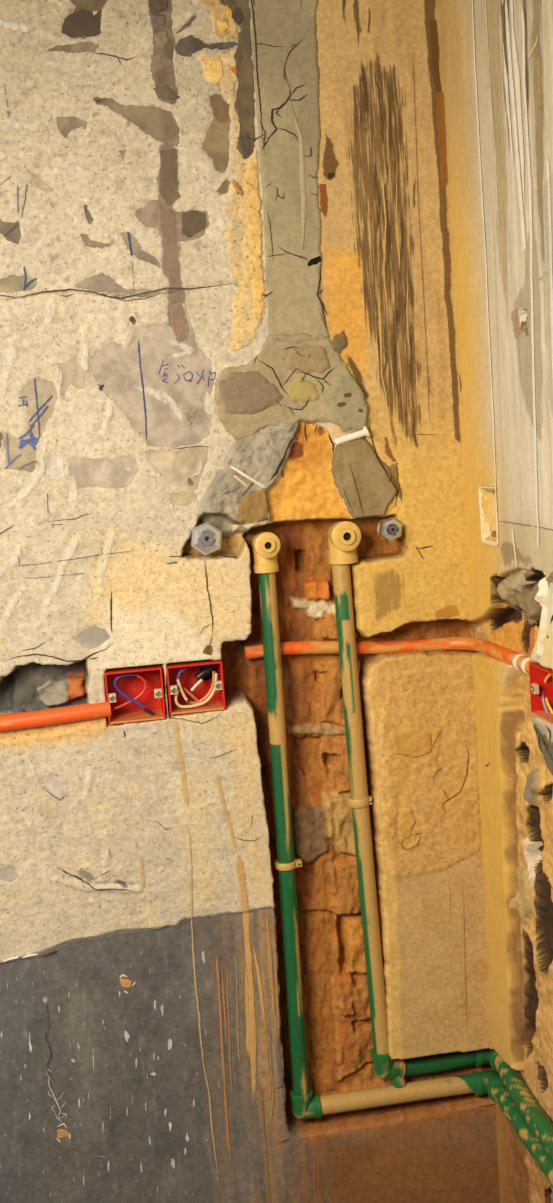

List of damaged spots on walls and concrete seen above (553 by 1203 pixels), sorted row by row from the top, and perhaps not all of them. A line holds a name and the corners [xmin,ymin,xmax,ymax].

peeling [48,0,107,53]
peeling [93,97,180,146]
peeling [0,220,21,244]
crack [0,283,274,301]
peeling [135,200,209,241]
crack [221,0,398,511]
peeling [349,56,421,447]
water stain [348,357,369,399]
flaking render [355,567,546,678]
flaking render [0,303,493,1124]
flaking render [508,671,553,1123]
water stain [189,775,279,1200]